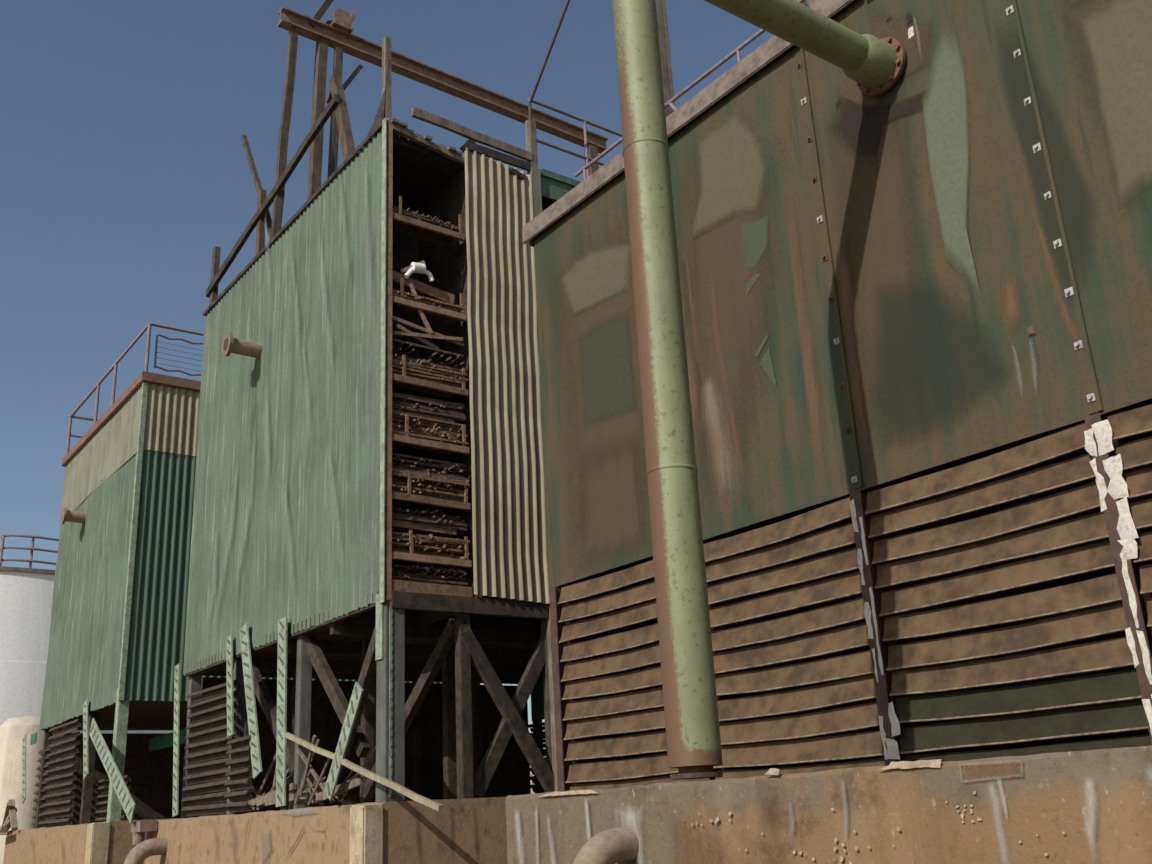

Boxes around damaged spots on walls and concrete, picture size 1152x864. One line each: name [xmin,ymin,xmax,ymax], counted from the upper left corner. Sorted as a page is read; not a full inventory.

rust [683,303,706,415]
rust [794,255,819,440]